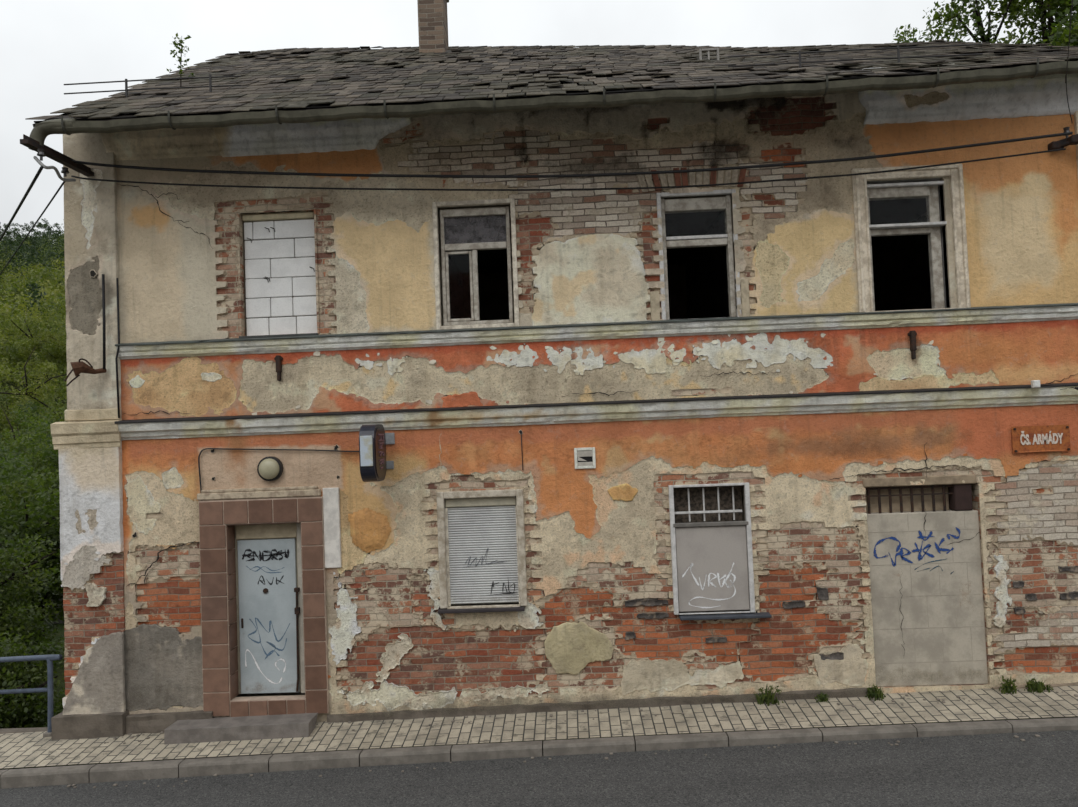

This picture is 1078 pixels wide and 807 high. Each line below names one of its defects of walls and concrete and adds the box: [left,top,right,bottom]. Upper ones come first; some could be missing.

damp [706,97,786,125]
crack [119,184,210,243]
peeling [152,94,883,339]
peeling [126,333,833,417]
peeling [859,340,999,391]
peeling [61,467,201,708]
crack [126,542,200,587]
peeling [328,453,1078,714]